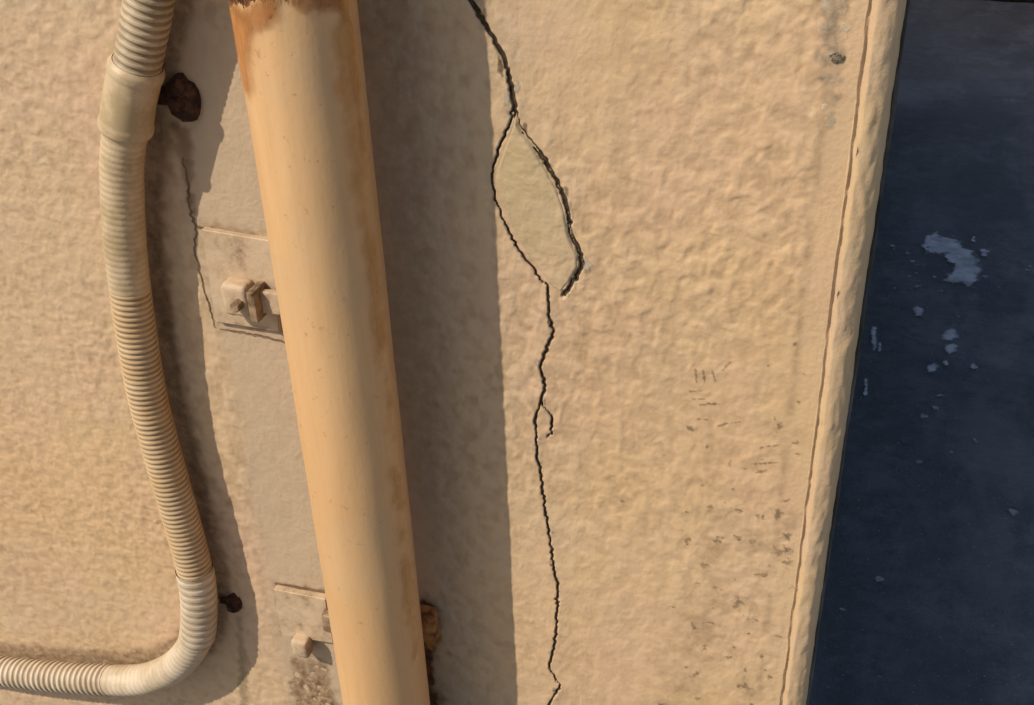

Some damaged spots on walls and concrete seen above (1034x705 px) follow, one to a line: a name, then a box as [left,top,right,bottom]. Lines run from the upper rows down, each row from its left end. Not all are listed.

corrosion [229,0,287,91]
crack [468,0,592,705]
corrosion [424,636,443,705]